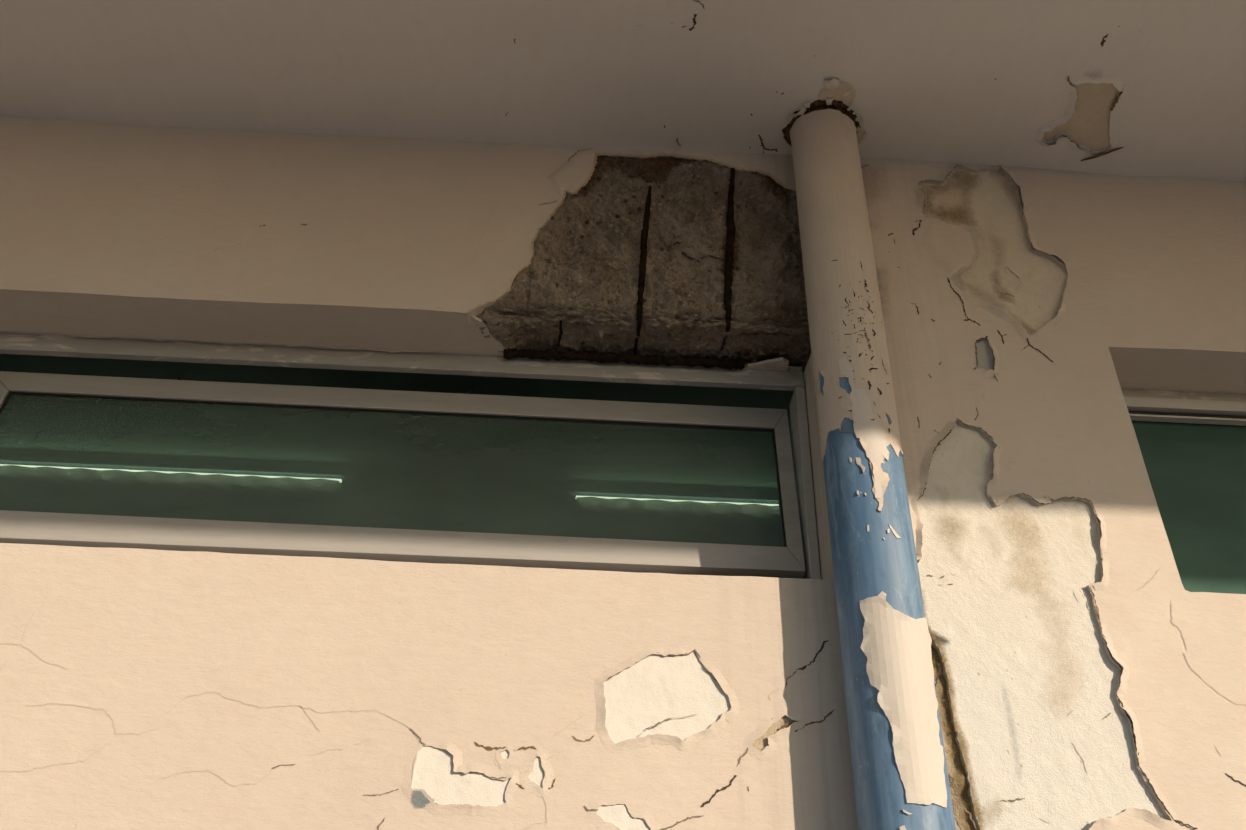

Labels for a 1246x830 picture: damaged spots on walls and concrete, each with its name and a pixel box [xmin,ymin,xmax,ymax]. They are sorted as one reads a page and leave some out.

corrosion [574,155,696,196]
peeling [1035,75,1130,161]
spalling [467,138,811,372]
peeling [911,162,1075,341]
peeling [911,413,1197,830]
crack [0,691,420,787]
peeling [402,728,554,817]
crack [474,715,594,830]
peeling [584,794,660,830]
peeling [595,642,740,753]
crack [660,640,834,830]
damp [928,628,983,830]